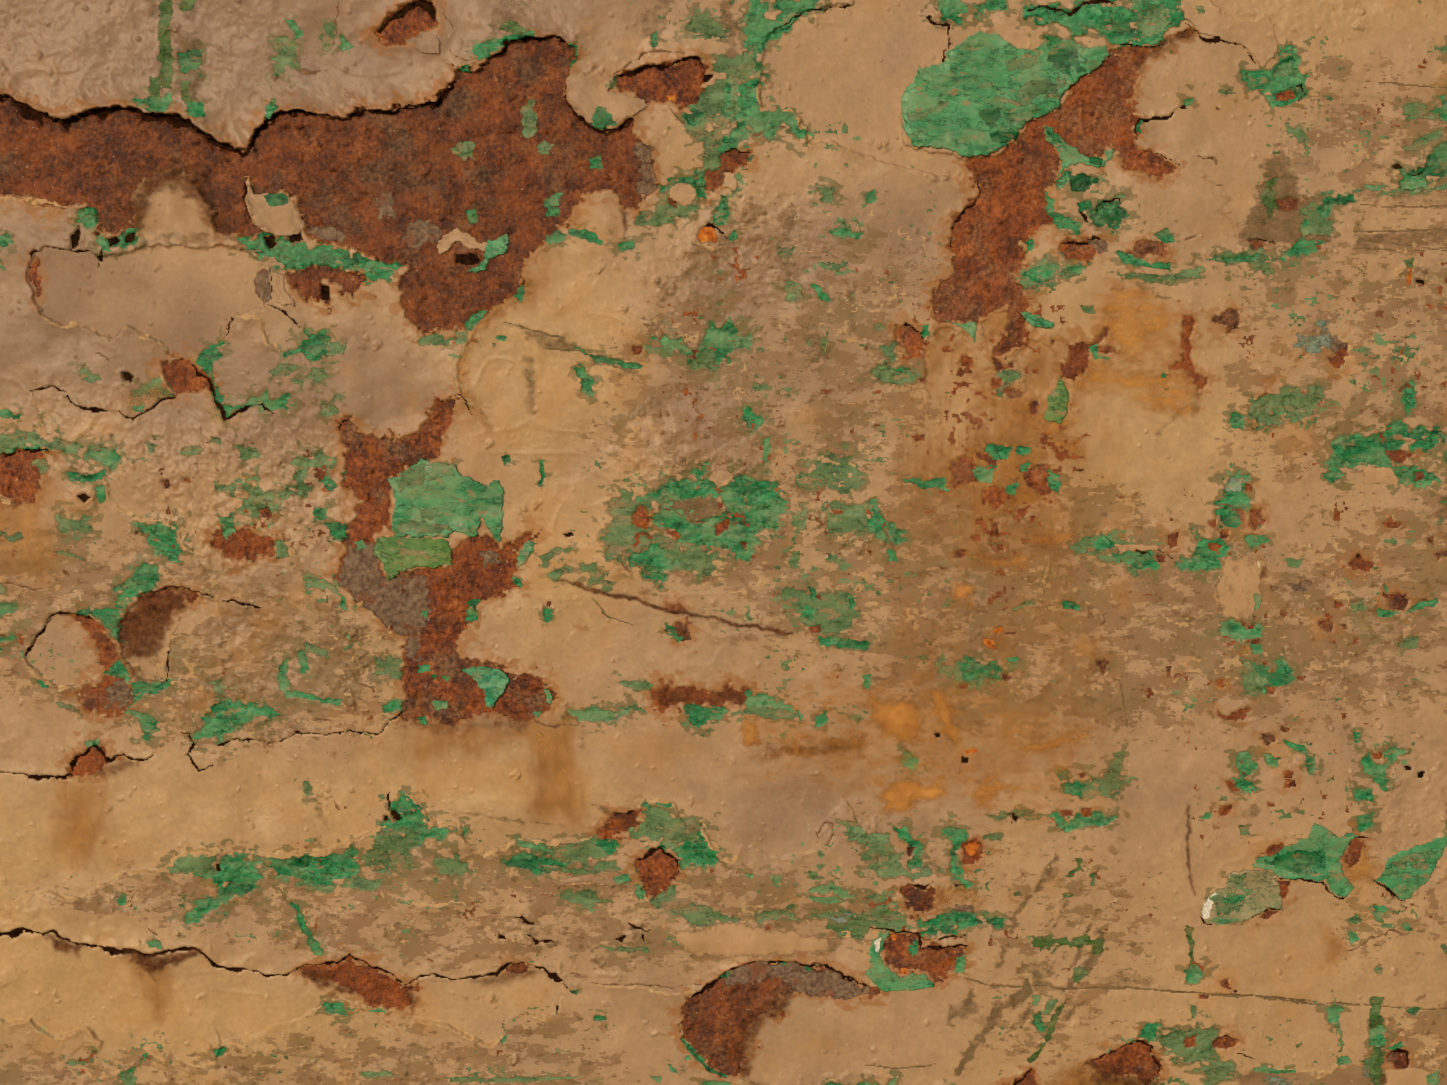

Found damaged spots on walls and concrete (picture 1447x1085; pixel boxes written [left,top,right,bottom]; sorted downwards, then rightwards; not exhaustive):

crack [772,4,850,33]
crack [1027,0,1167,47]
peeling [566,46,648,129]
corrosion [614,49,713,109]
peeling [756,0,1110,178]
peeling [242,177,305,236]
corrosion [1222,194,1366,263]
corrosion [0,27,659,726]
corrosion [838,30,1207,650]
peeling [1200,823,1358,925]
peeling [1373,836,1447,902]
crack [0,927,701,1022]